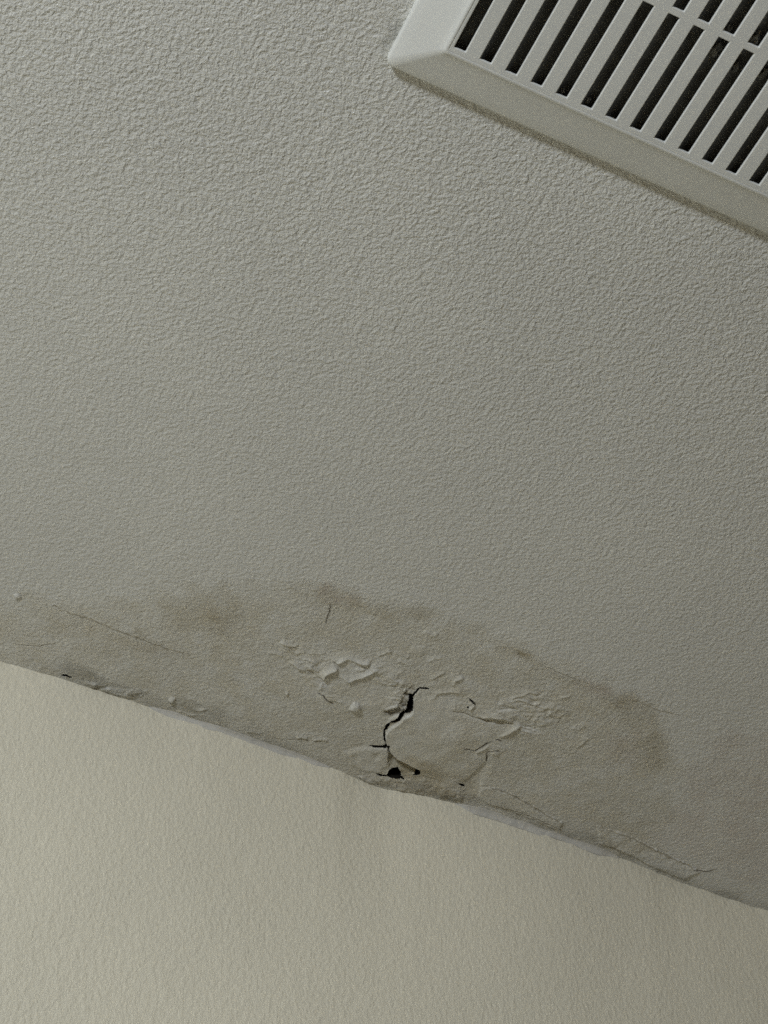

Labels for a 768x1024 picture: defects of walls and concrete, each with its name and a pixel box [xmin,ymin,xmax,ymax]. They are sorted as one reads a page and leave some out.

flaking render [384,685,416,724]
crack [370,687,429,765]
spalling [388,753,415,775]